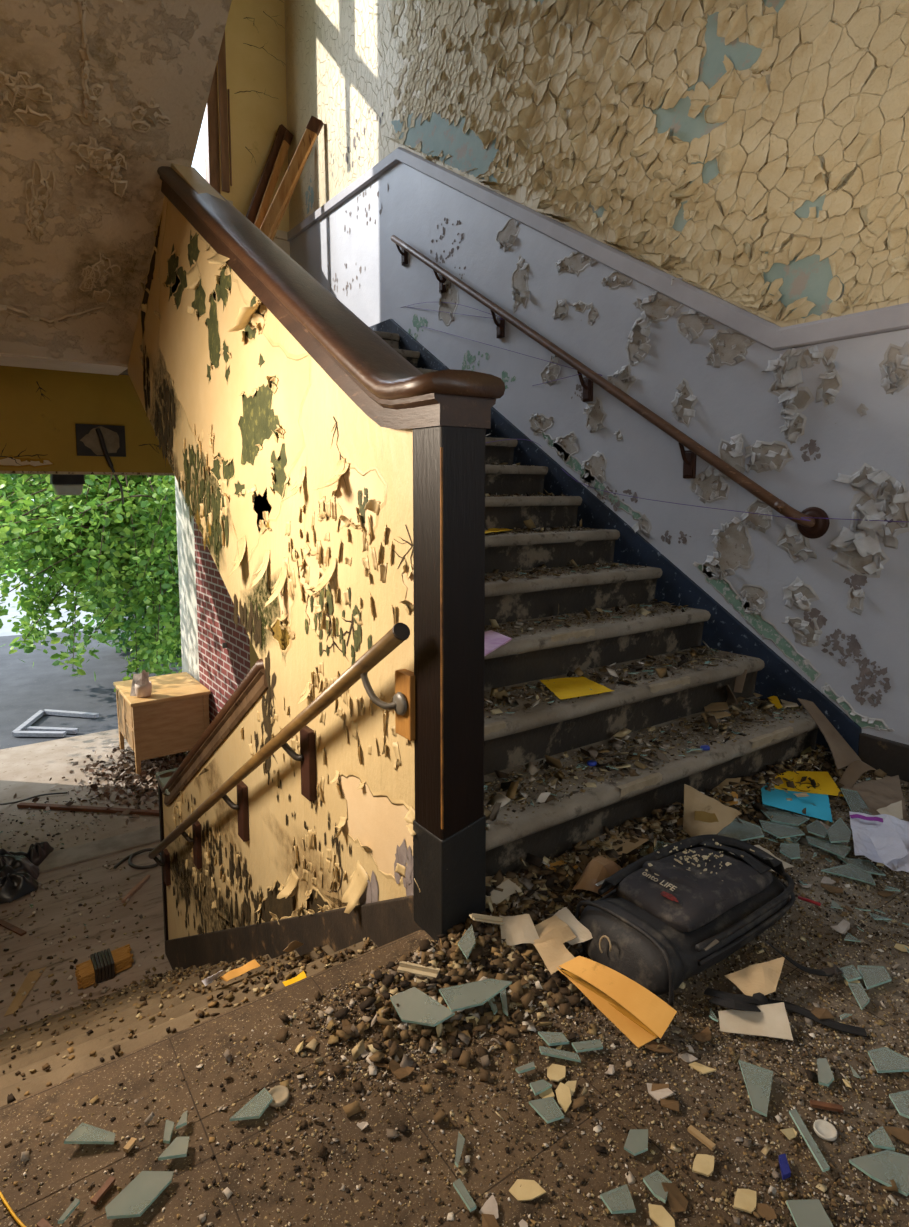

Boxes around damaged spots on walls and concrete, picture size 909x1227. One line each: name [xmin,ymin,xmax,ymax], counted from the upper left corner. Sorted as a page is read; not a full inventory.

spalling [344,185,389,234]
peeling [376,0,909,395]
peeling [528,384,691,545]
peeling [671,378,698,428]
peeling [689,345,842,503]
peeling [154,199,421,924]
peeling [693,463,909,732]
spalling [648,676,691,693]